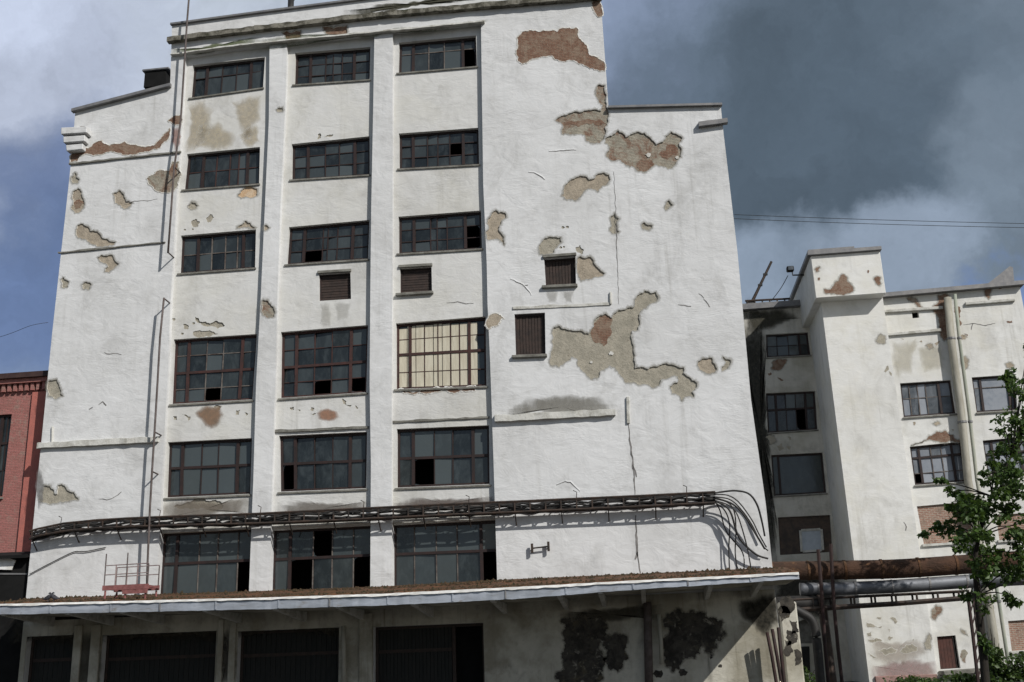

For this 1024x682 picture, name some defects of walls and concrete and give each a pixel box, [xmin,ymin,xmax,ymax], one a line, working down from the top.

flaking render [515,27,682,173]
flaking render [69,115,184,272]
spalling [561,172,610,201]
spalling [486,210,507,245]
flaking render [815,267,854,295]
spalling [549,290,732,401]
crack [628,424,637,490]
spalling [41,484,79,504]
crack [634,515,642,573]
water stain [569,606,644,621]